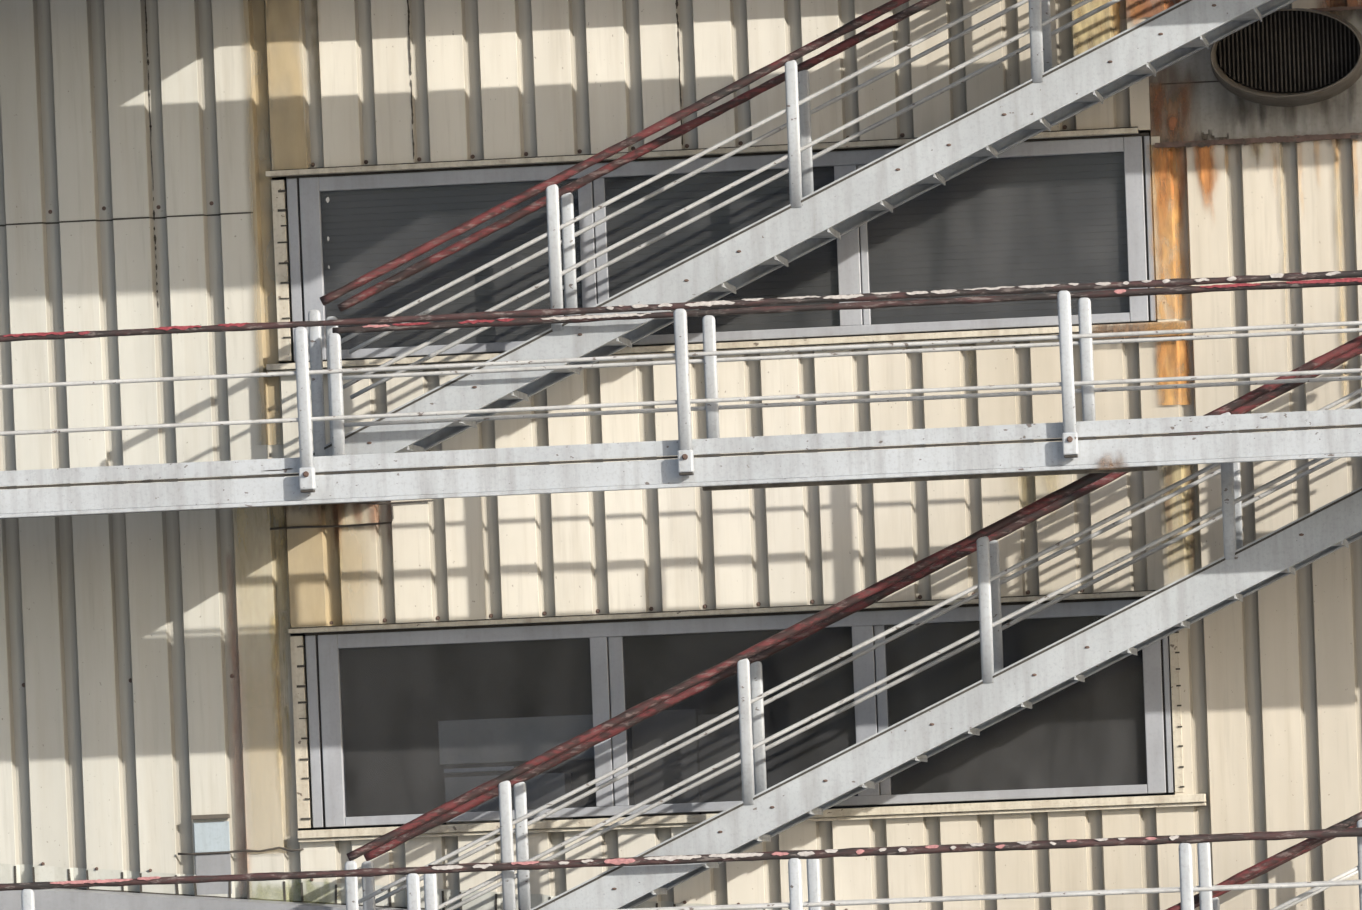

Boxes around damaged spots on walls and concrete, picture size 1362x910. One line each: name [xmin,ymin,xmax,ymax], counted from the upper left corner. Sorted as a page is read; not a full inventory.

rust [1128,0,1183,18]
rust [1149,68,1362,279]
rust [1096,294,1191,405]